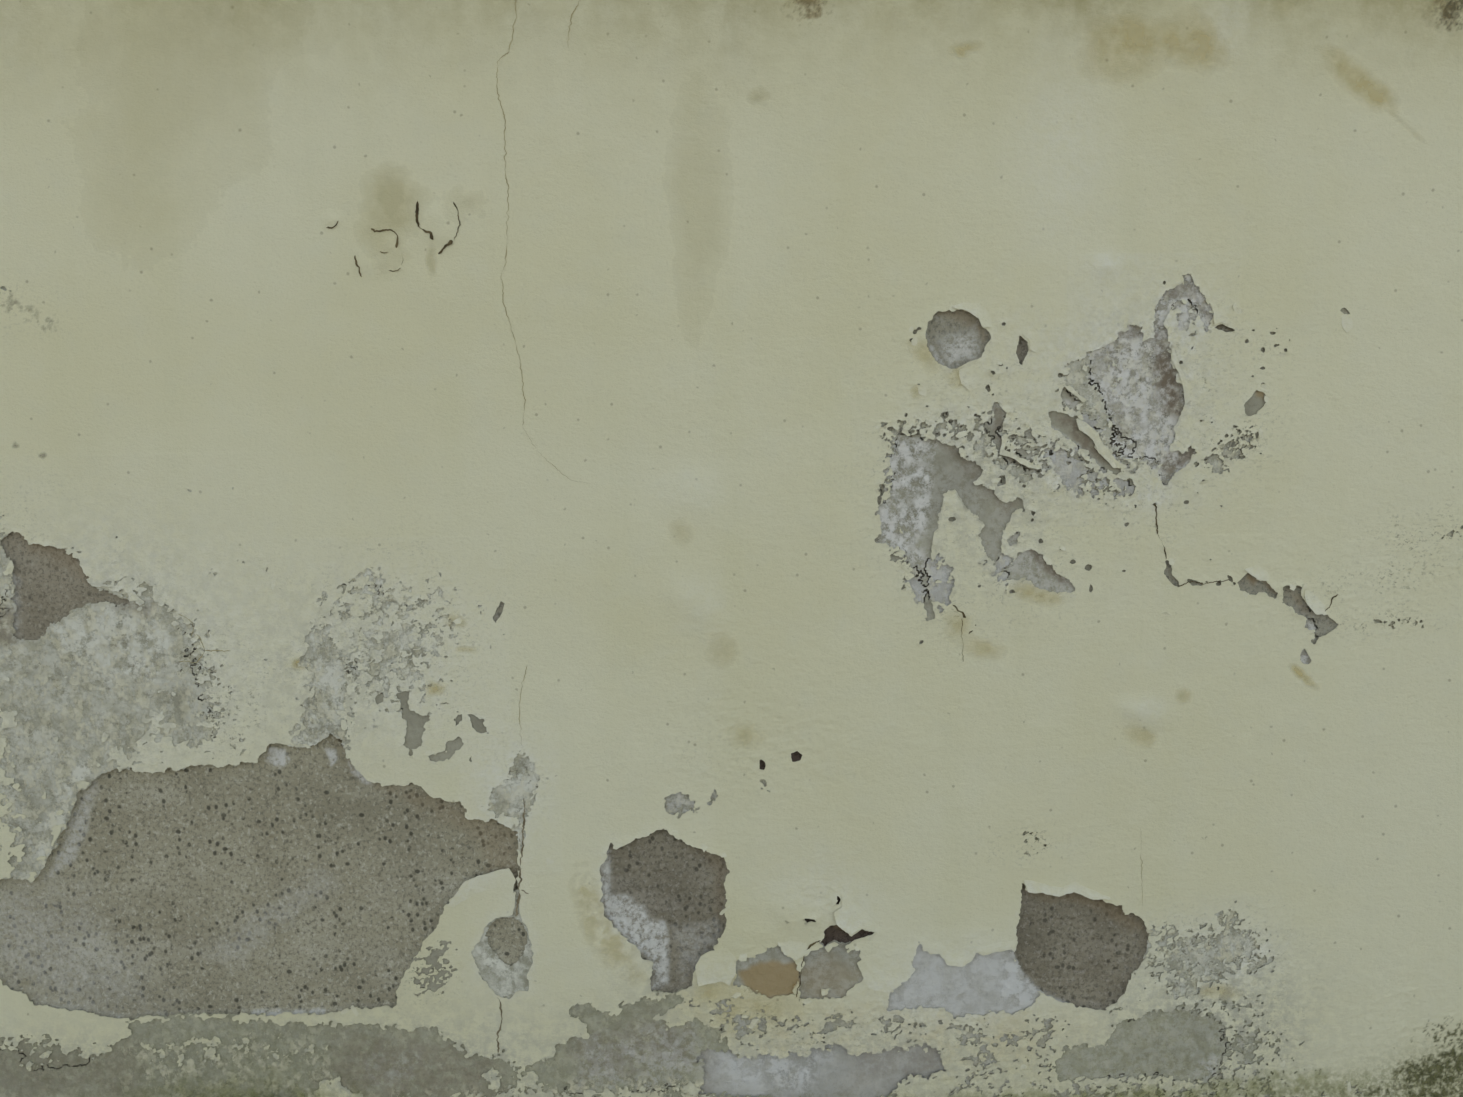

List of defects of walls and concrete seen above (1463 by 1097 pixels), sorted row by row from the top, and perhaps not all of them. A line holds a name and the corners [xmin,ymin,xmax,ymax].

crack [496,0,585,483]
peeling [873,274,1290,621]
damp [1443,0,1463,25]
flaking render [0,515,1338,1097]